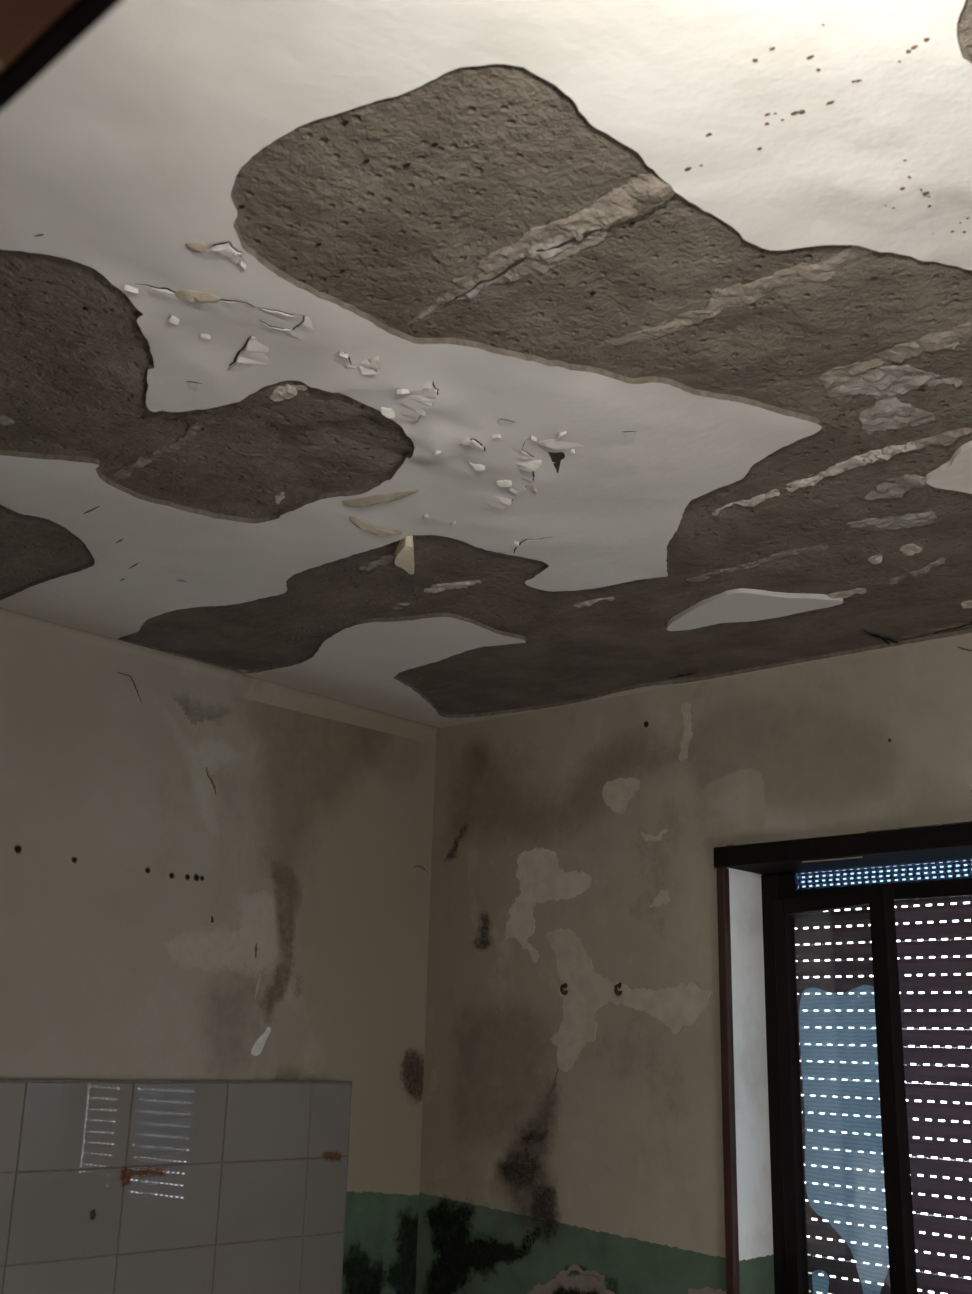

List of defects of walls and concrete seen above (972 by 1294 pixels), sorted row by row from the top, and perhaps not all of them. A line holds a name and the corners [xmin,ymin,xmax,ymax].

spalling [957,0,972,63]
spalling [0,64,972,718]
peeling [602,777,640,814]
peeling [505,847,713,1072]
corrosion [121,1167,164,1186]
damp [342,1068,558,1294]
peeling [526,1264,618,1294]